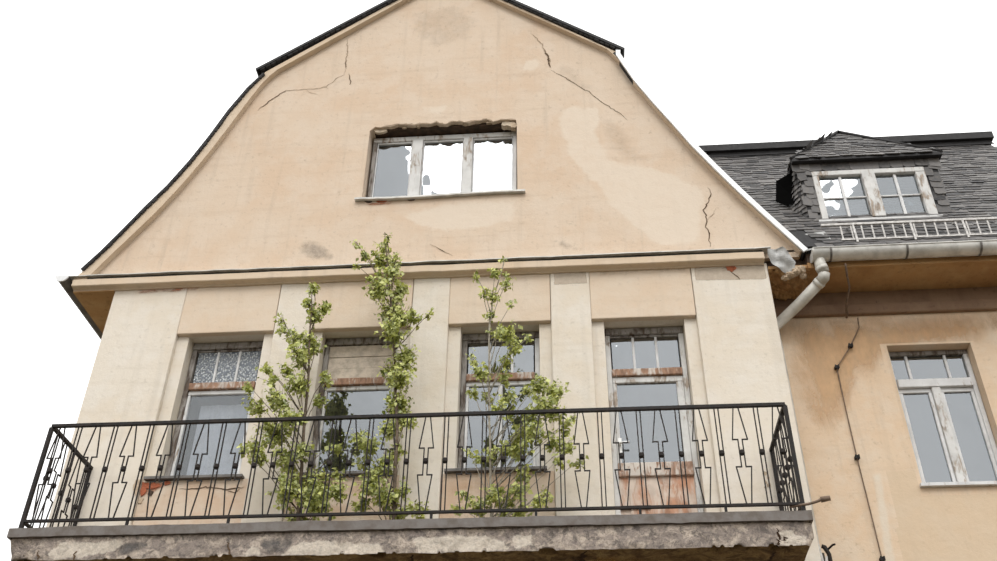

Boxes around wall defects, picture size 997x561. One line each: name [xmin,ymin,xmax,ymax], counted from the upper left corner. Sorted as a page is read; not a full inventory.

crack [259,40,351,109]
crack [518,33,624,117]
crack [703,188,715,246]
crack [725,266,740,279]